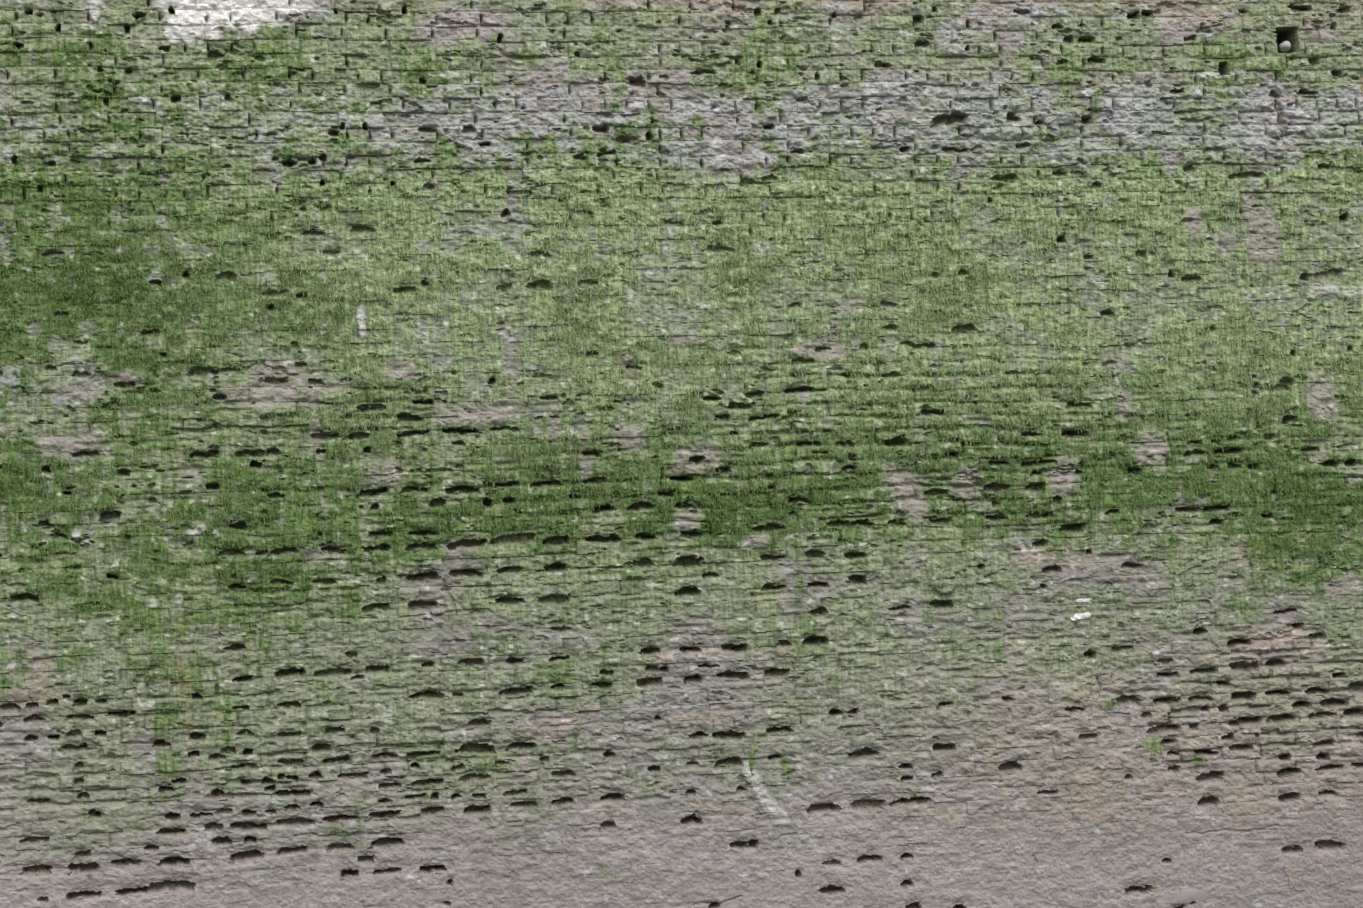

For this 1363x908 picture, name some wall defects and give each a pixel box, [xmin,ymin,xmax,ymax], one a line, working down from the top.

water stain [748,237,772,259]
water stain [1304,284,1363,306]
water stain [356,298,367,339]
water stain [170,605,201,802]